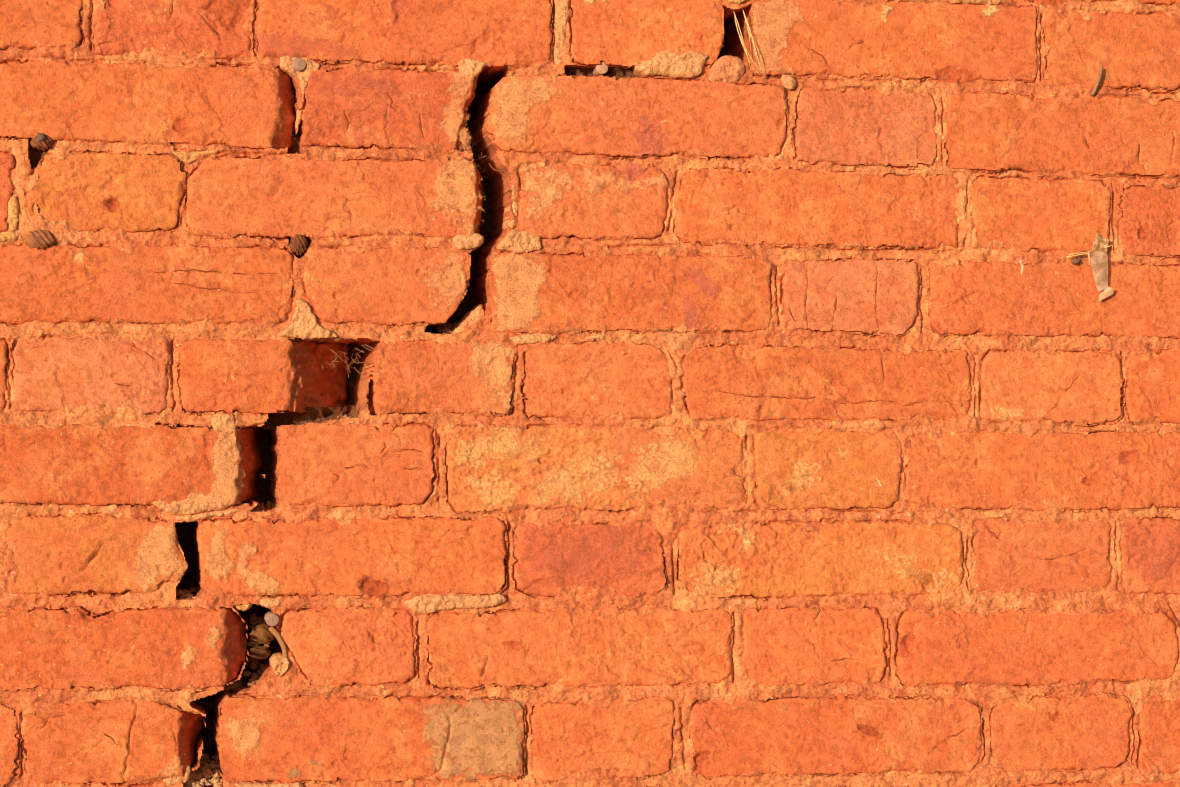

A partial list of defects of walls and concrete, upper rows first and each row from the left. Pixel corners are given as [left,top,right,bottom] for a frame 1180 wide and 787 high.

crack [717,21,729,58]
crack [564,66,643,80]
crack [385,94,424,140]
crack [425,80,493,334]
crack [153,269,279,296]
crack [245,343,367,506]
crack [332,442,426,480]
crack [175,522,198,593]
crack [172,604,279,774]